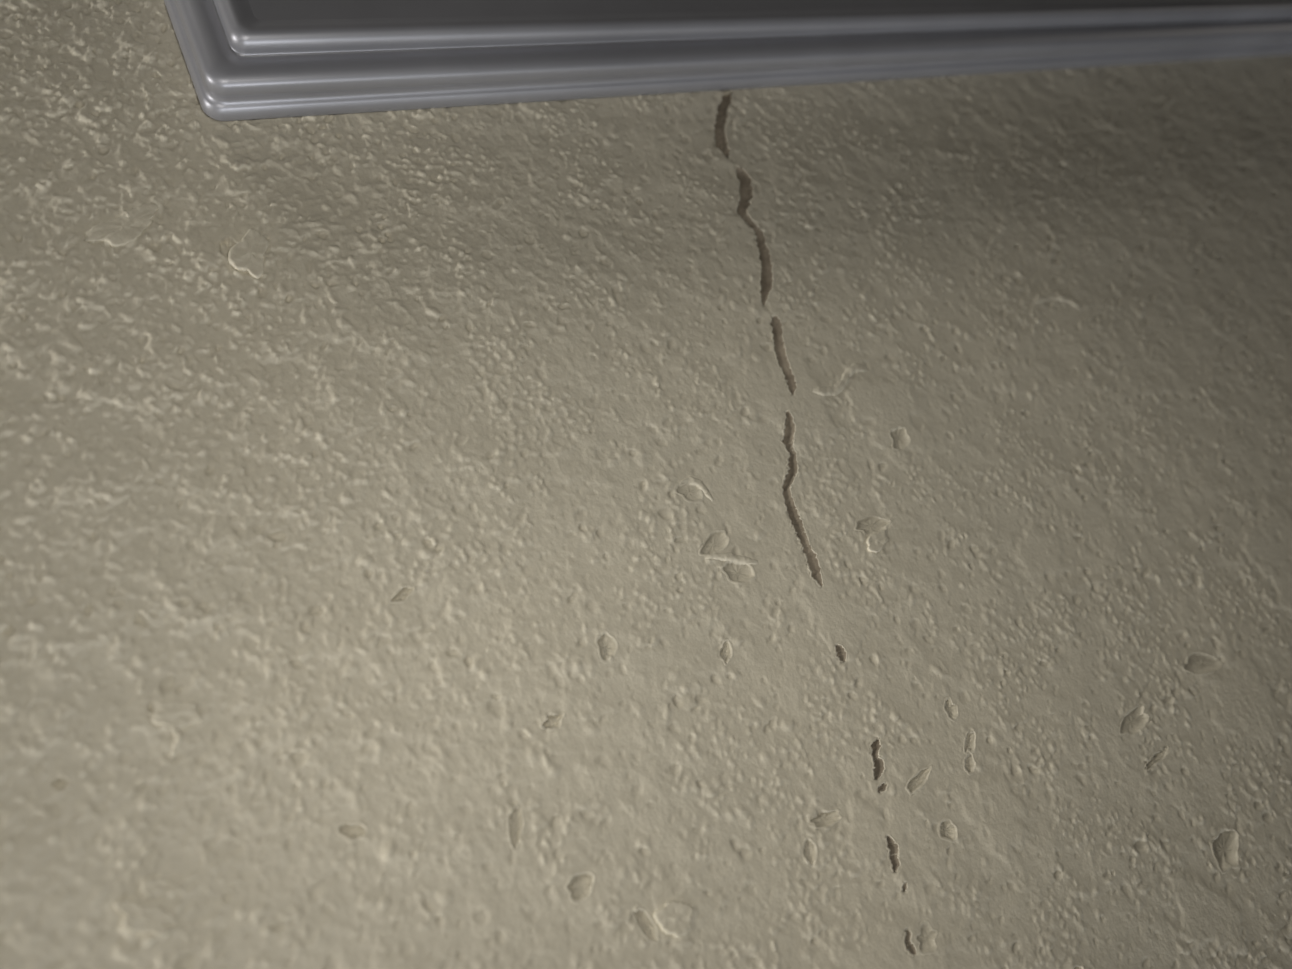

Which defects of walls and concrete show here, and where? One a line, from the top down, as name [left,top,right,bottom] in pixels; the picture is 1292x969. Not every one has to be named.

crack [711,90,824,587]
crack [834,643,848,663]
crack [869,738,889,794]
crack [885,834,909,891]
crack [902,930,918,957]